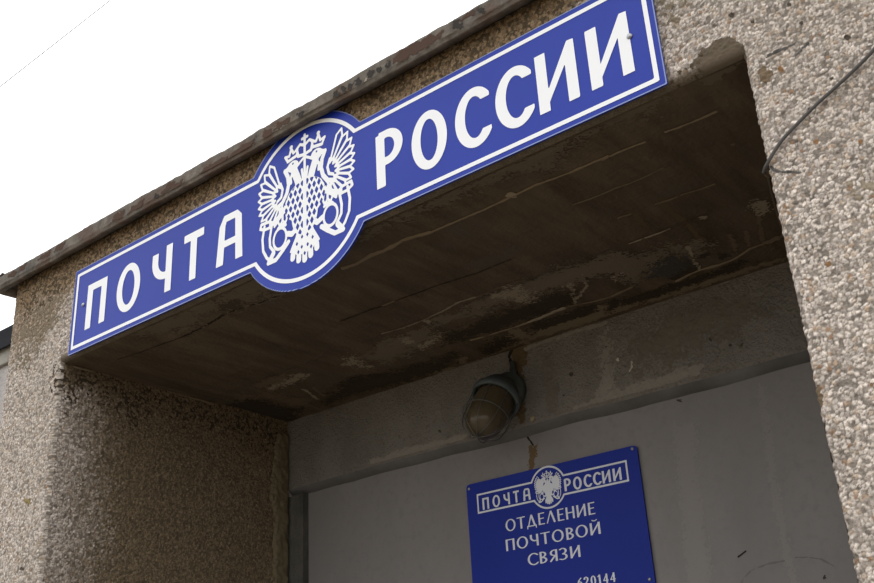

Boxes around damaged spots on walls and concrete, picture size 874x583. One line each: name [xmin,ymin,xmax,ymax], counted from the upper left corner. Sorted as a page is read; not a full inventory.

leakage [50,198,785,457]